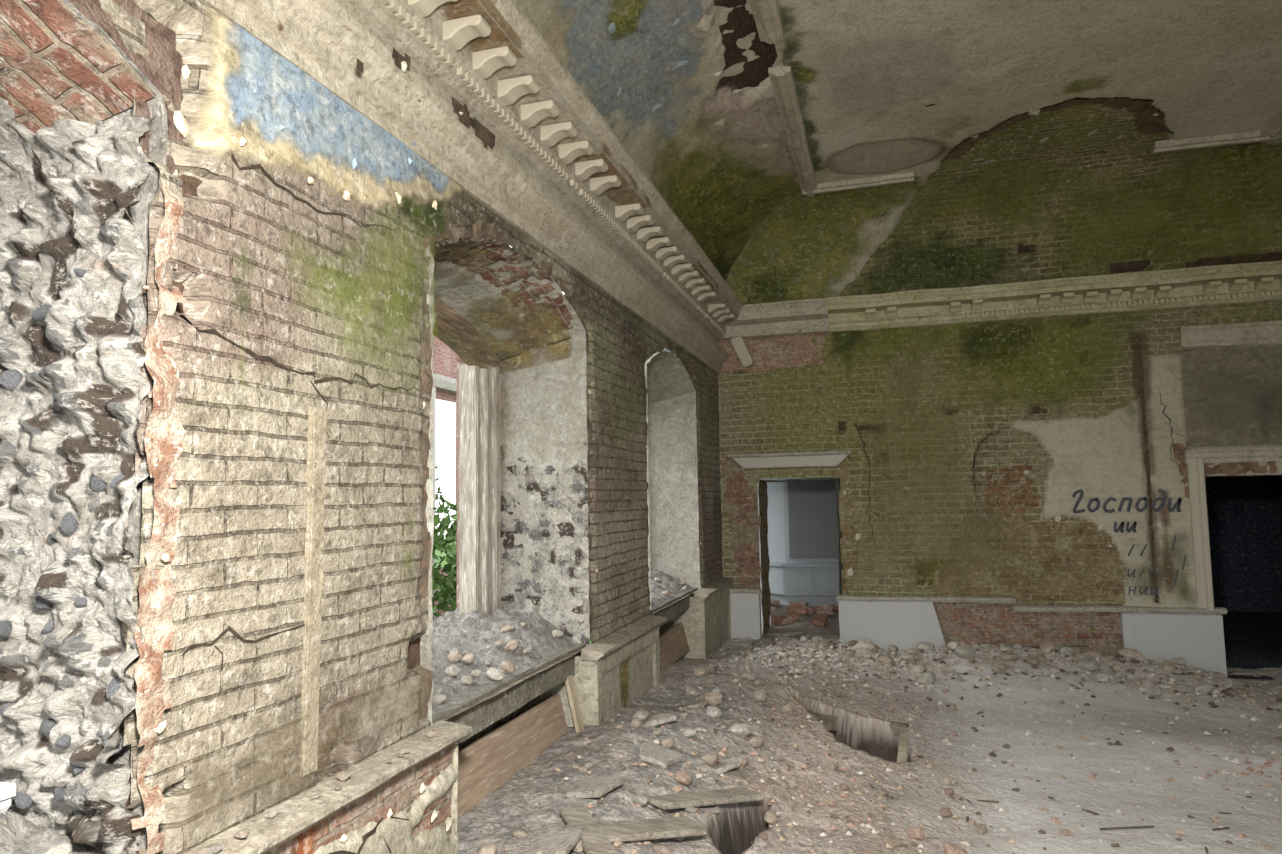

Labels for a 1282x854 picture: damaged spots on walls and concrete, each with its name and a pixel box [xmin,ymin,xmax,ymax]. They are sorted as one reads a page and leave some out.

damp [608,0,646,37]
peeling [559,0,795,169]
crack [230,154,396,245]
damp [657,144,920,305]
flaking render [838,97,1282,297]
spalling [0,0,462,854]
crack [179,315,420,438]
flaking render [917,464,1126,658]
crack [182,624,305,670]